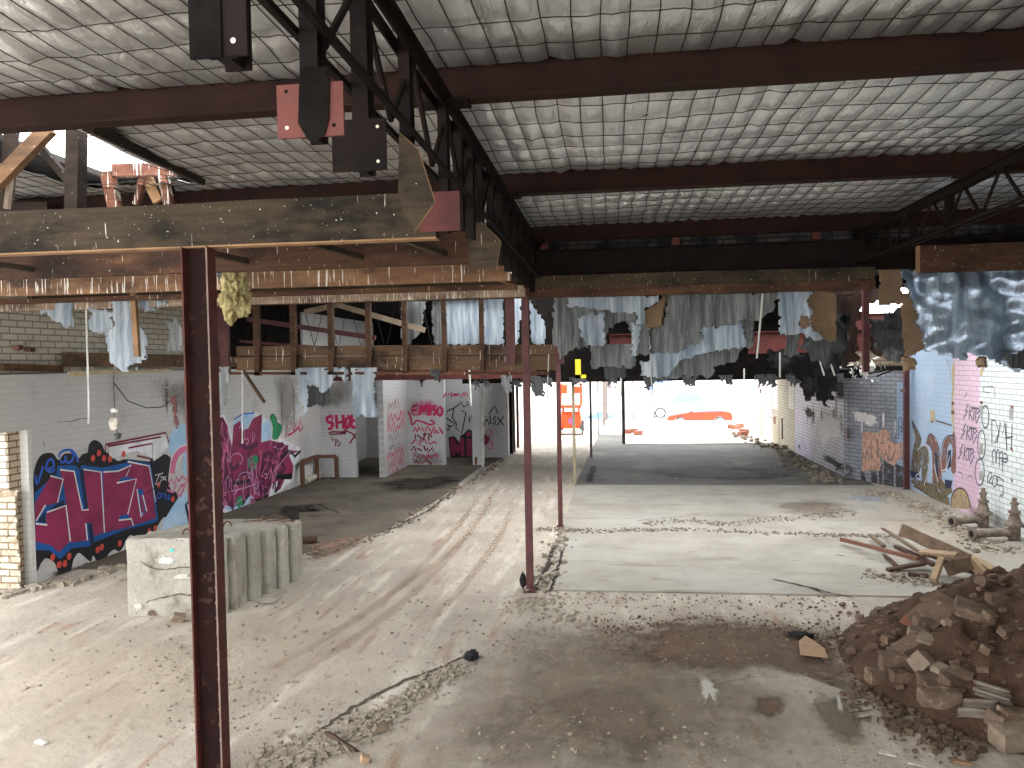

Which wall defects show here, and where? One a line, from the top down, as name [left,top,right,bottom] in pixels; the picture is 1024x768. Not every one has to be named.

crack [534,545,565,591]
crack [293,657,463,746]